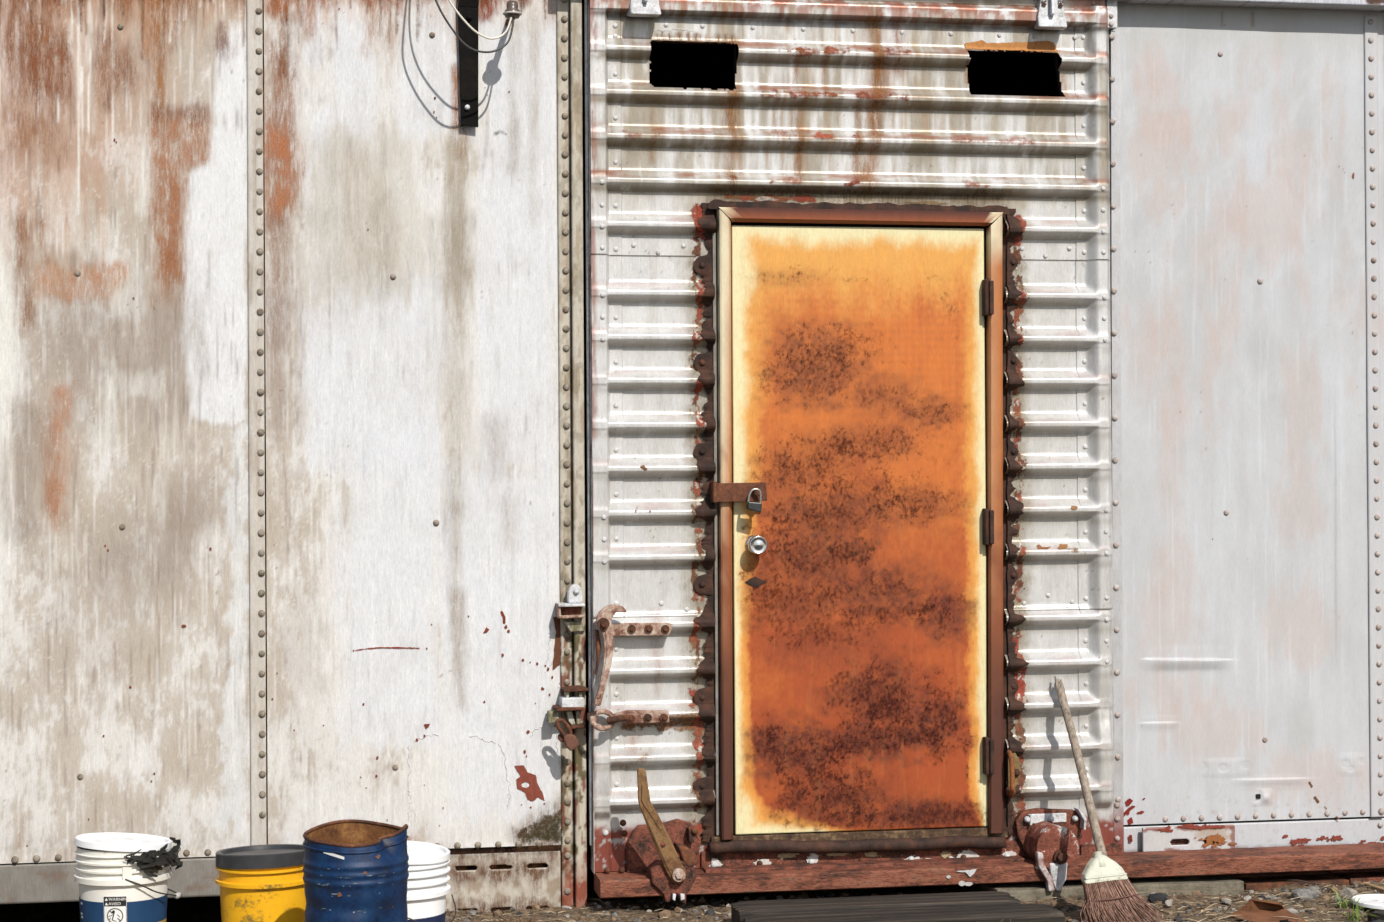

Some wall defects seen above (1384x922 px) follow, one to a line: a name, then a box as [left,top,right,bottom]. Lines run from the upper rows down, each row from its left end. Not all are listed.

corrosion [10,22,69,96]
corrosion [104,0,206,277]
corrosion [784,18,909,188]
corrosion [739,432,959,645]
peeling [515,730,545,808]
corrosion [756,661,987,829]
peeling [1283,835,1384,846]